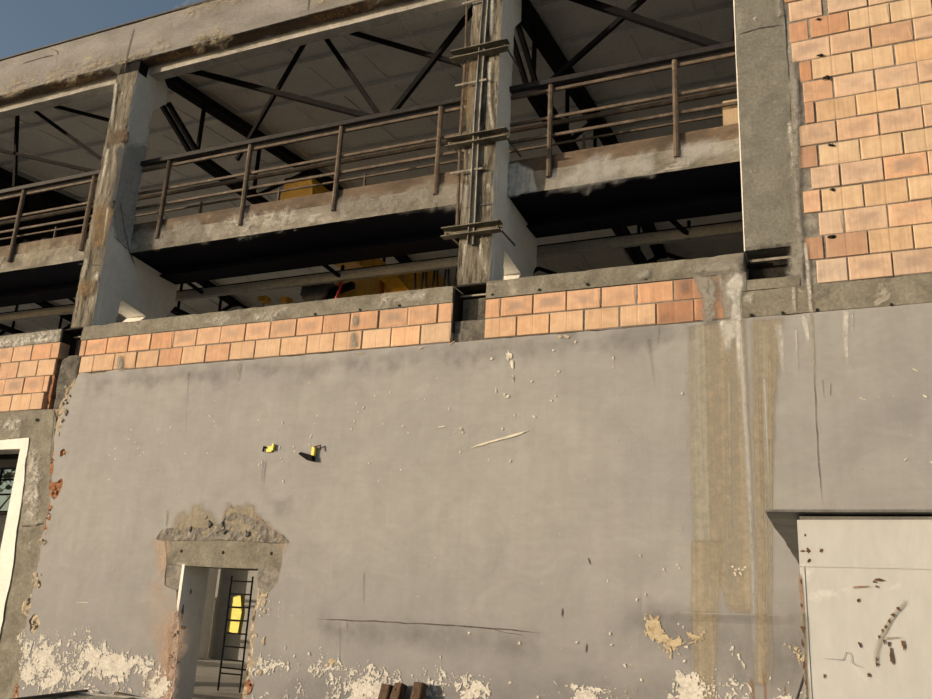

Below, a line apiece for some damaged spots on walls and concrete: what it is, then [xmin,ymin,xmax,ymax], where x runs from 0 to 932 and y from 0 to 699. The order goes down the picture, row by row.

corrosion [93,204,113,247]
water stain [788,62,826,378]
flaking render [55,379,76,436]
flaking render [38,449,68,547]
spalling [156,505,289,543]
water stain [687,260,783,699]
peeling [242,592,492,699]
crack [324,619,537,635]
peeling [554,681,634,699]
peeling [644,614,752,699]
corrosion [799,576,809,699]
corrosion [867,603,905,677]